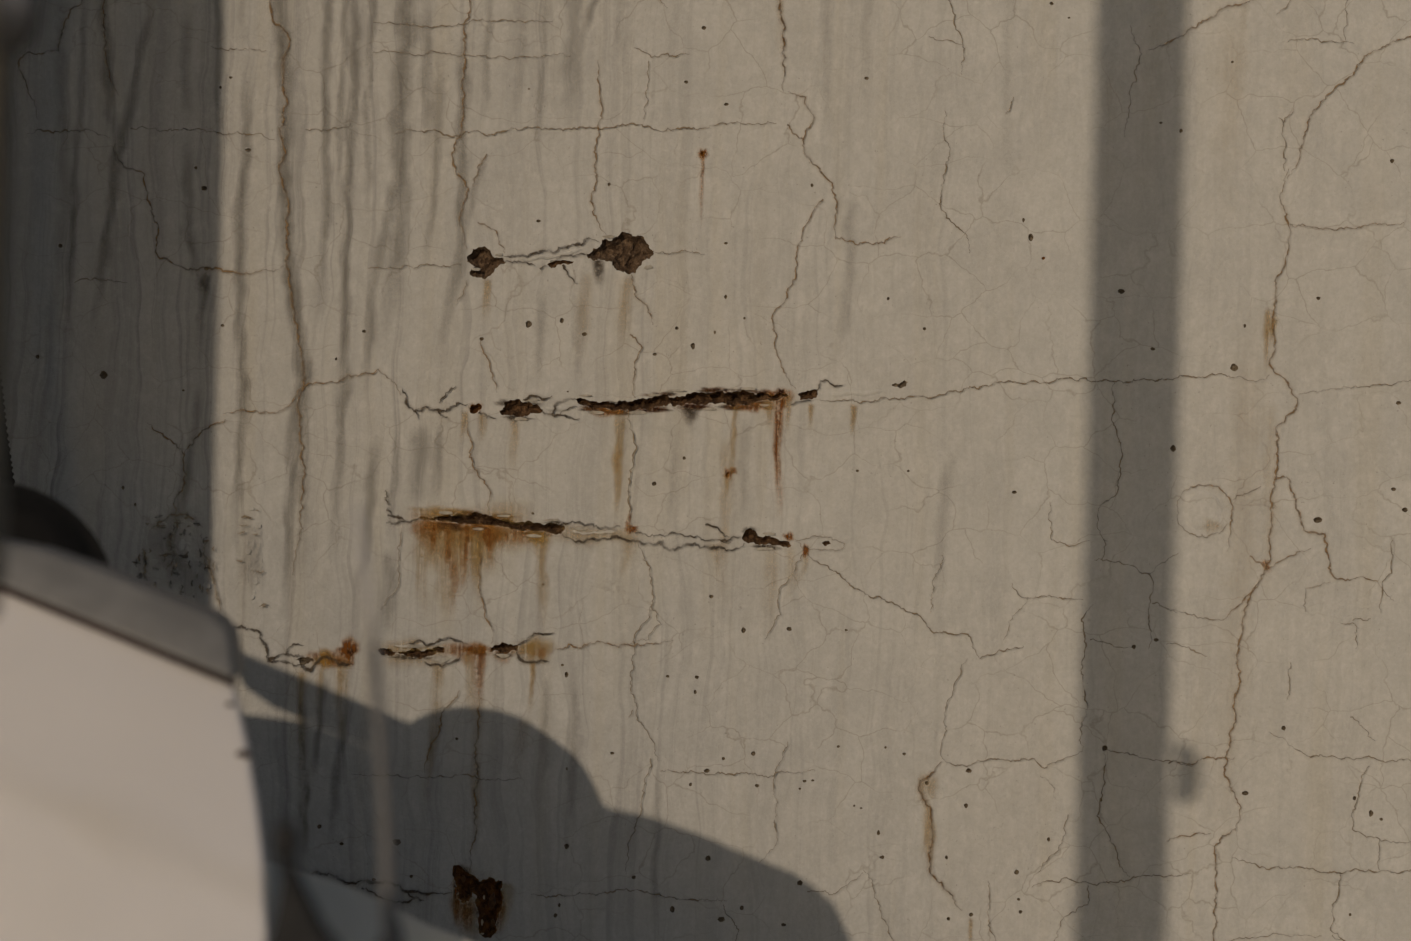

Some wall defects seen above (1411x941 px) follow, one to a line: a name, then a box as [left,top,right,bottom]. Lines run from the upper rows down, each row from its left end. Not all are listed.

spalling [467,246,506,279]
spalling [547,232,654,274]
spalling [500,399,543,421]
spalling [567,387,818,414]
corrosion [582,388,790,482]
crack [18,0,813,941]
crack [369,0,1411,941]
corrosion [420,509,560,573]
corrosion [314,639,358,667]
corrosion [450,641,548,683]